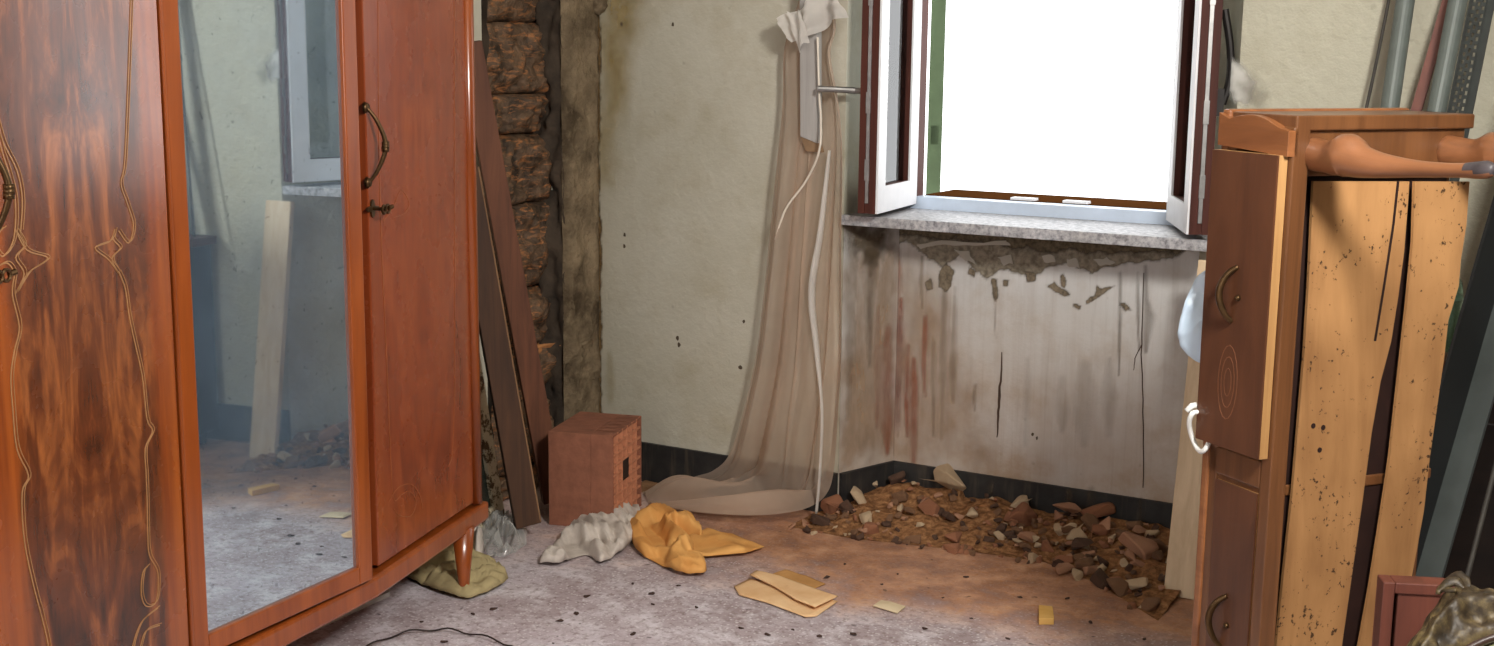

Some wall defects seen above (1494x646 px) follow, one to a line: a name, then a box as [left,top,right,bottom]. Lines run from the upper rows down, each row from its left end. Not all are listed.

spalling [484,195,539,501]
spalling [481,0,608,429]
leakage [844,225,889,443]
crack [995,352,1003,437]
flaking render [899,229,1185,310]